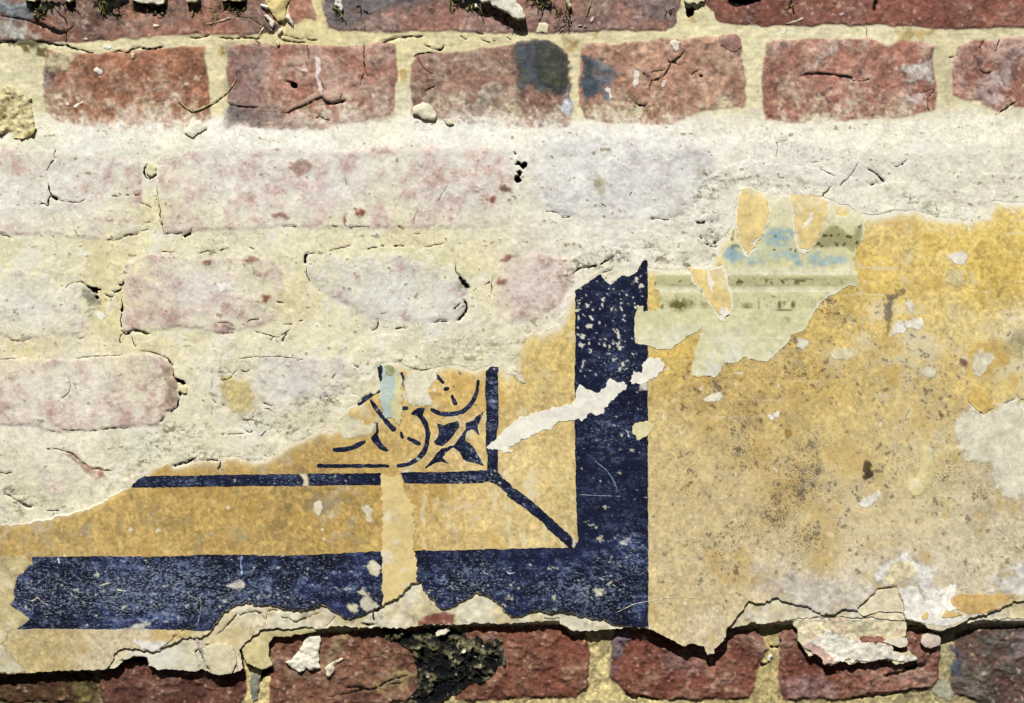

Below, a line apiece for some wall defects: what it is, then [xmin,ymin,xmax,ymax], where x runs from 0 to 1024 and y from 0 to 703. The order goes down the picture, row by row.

spalling [0,86,37,139]
crack [41,149,85,206]
crack [107,165,253,253]
crack [304,186,447,281]
crack [61,281,179,422]
crack [211,301,302,436]
peeling [402,369,439,406]
crack [47,427,128,471]
peeling [954,398,1024,500]
peeling [0,555,33,674]
peeling [347,588,381,619]
peeling [883,636,908,648]